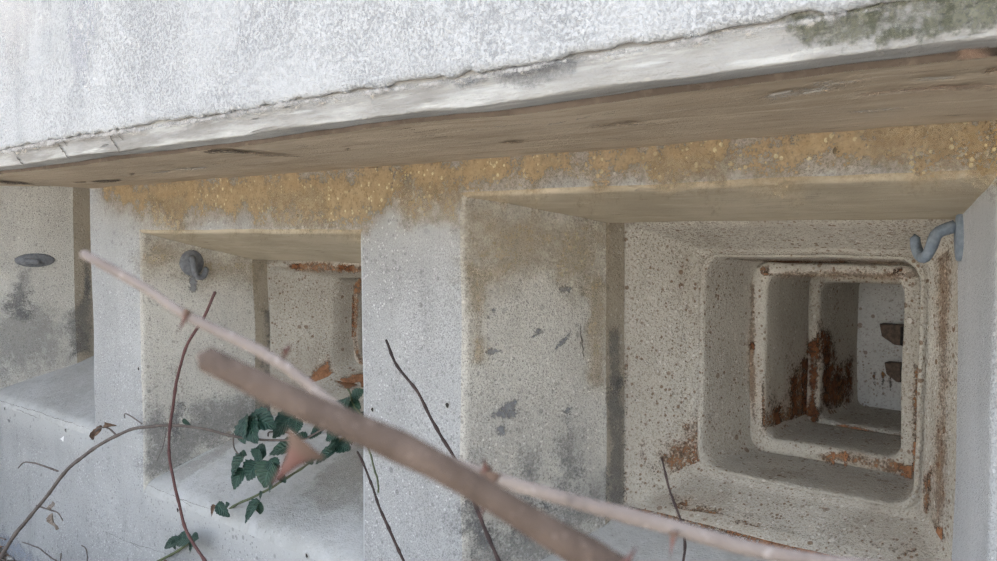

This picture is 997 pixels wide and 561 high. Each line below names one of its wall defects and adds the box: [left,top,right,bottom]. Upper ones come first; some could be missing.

damp [75,120,997,231]
corrosion [289,262,364,389]
corrosion [760,321,853,431]
corrosion [818,366,932,513]
corrosion [623,491,828,555]